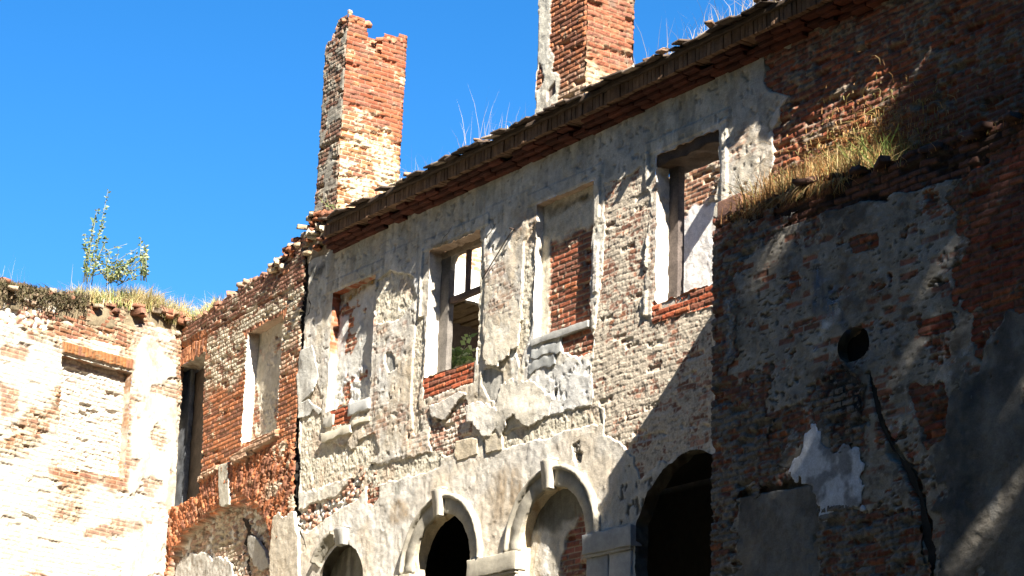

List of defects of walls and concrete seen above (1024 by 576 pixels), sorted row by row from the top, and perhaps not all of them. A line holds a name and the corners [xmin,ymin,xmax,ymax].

spalling [0,300,148,348]
spalling [247,0,1024,576]
peeling [175,552,236,576]
crack [870,374,936,576]